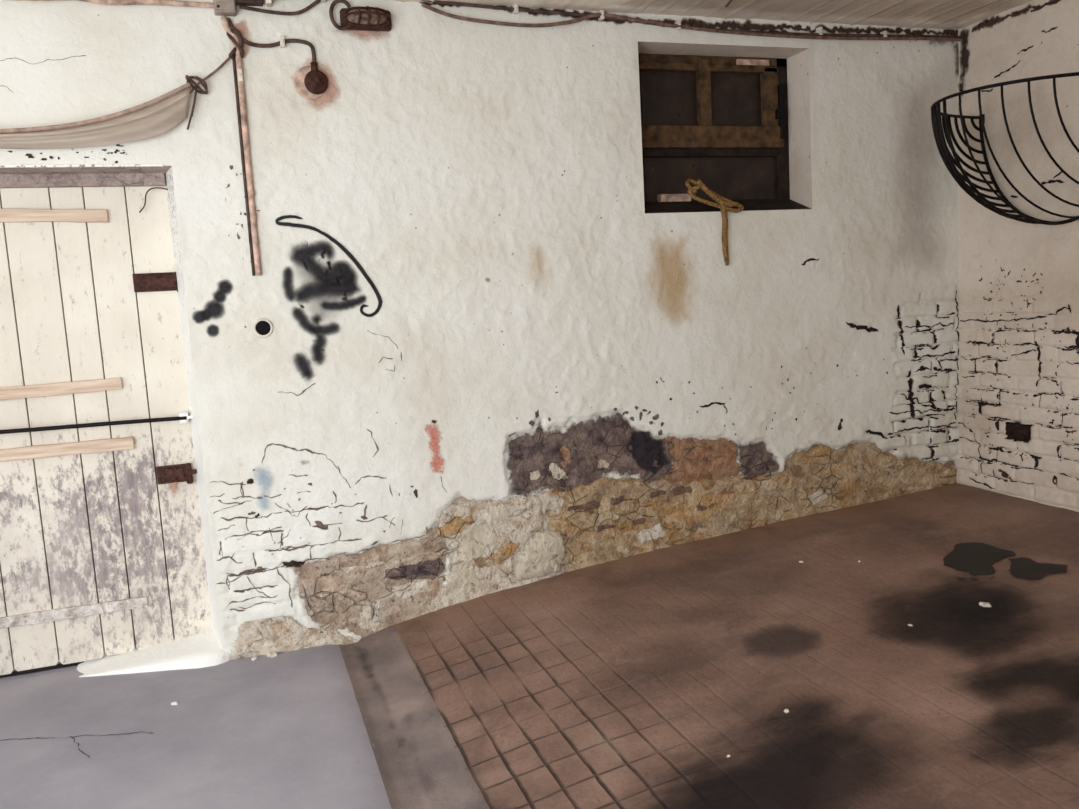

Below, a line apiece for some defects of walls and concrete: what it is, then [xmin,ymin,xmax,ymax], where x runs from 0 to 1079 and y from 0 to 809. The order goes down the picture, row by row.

rust [309,64,337,106]
crack [210,429,428,612]
flaking render [283,406,957,638]
water stain [749,629,812,653]
water stain [885,542,1068,655]
water stain [683,702,881,809]
water stain [967,657,1079,758]